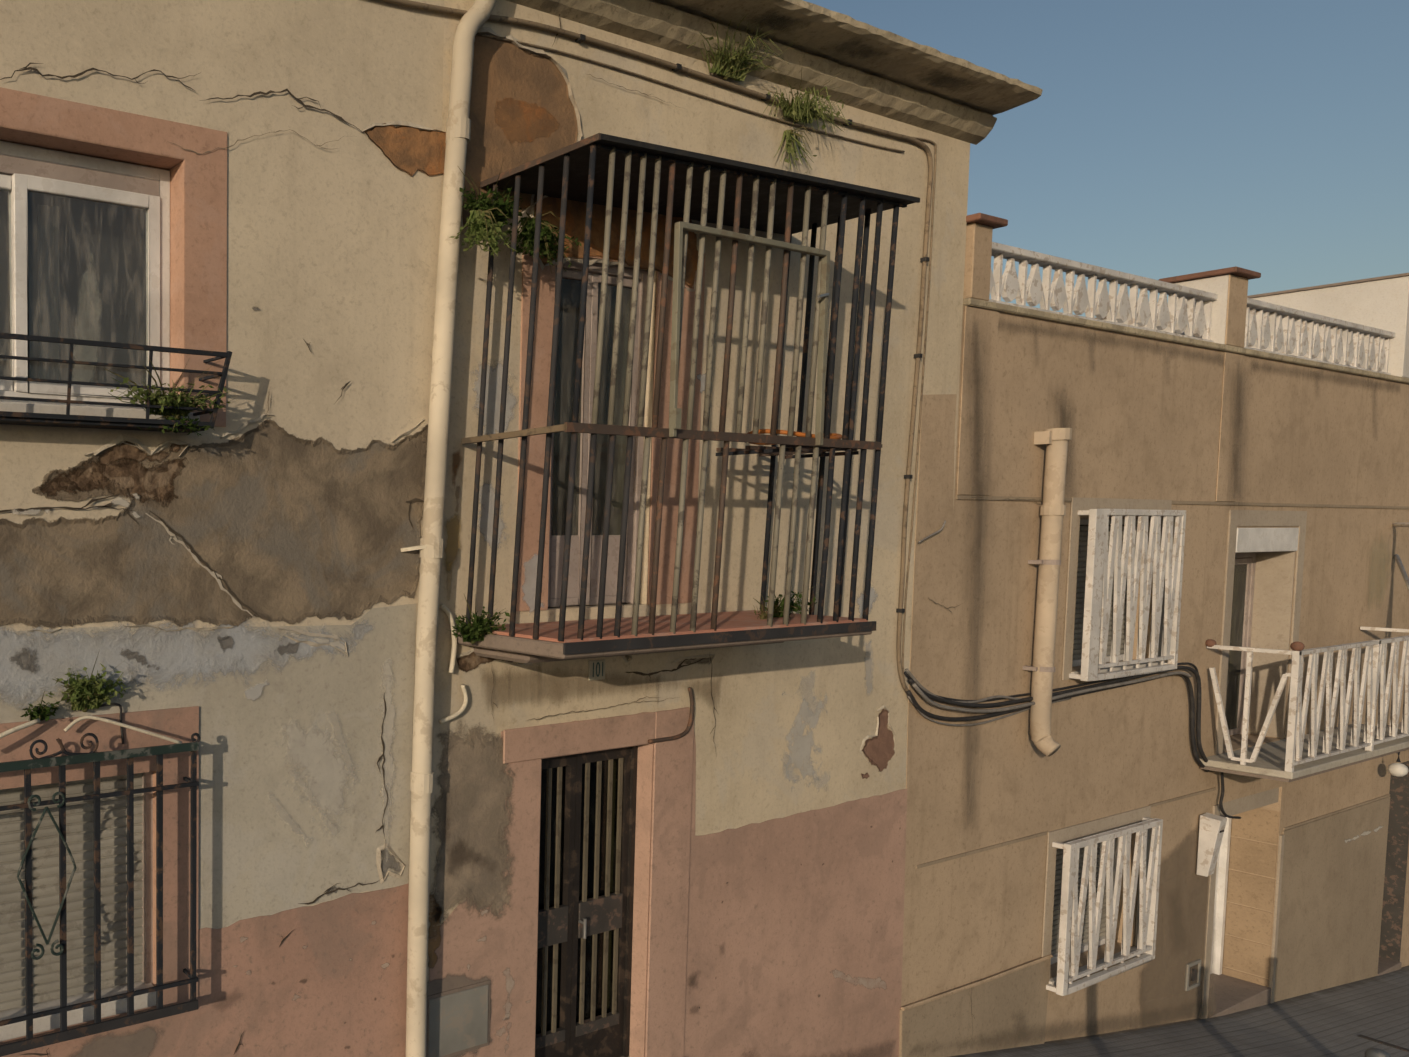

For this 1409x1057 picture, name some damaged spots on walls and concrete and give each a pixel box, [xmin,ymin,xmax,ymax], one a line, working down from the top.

crack [0,63,364,154]
spalling [362,118,448,176]
spalling [461,27,698,292]
crack [0,495,259,619]
spalling [0,413,428,709]
crack [279,693,388,947]
peeling [428,724,515,968]
spalling [859,705,895,779]